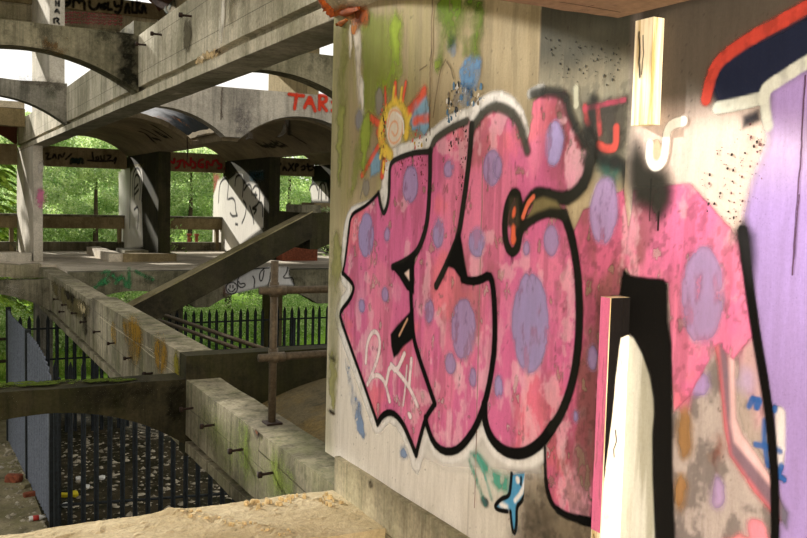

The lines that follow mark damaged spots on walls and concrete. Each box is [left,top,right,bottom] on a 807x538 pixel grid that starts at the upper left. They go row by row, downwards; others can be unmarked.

corrosion [318,0,368,35]
water stain [116,29,140,91]